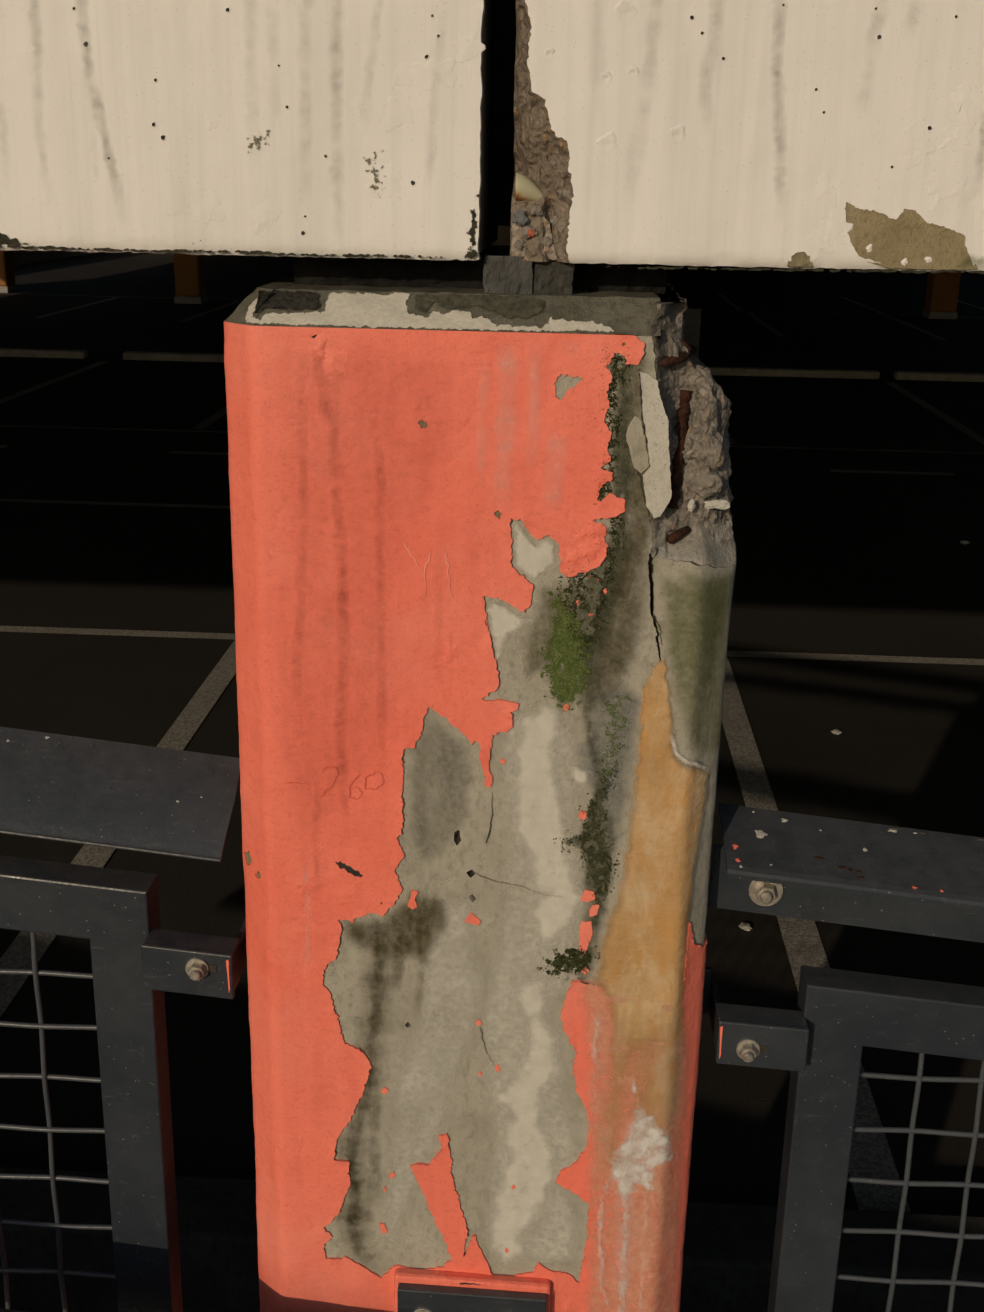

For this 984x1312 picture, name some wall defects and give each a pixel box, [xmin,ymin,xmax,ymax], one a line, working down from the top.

spalling [510,0,574,263]
peeling [787,252,813,267]
peeling [845,202,978,270]
crack [637,370,650,517]
crack [647,548,662,662]
peeling [323,282,736,1282]
corrosion [586,660,708,1312]
efflorescence [613,1114,672,1196]